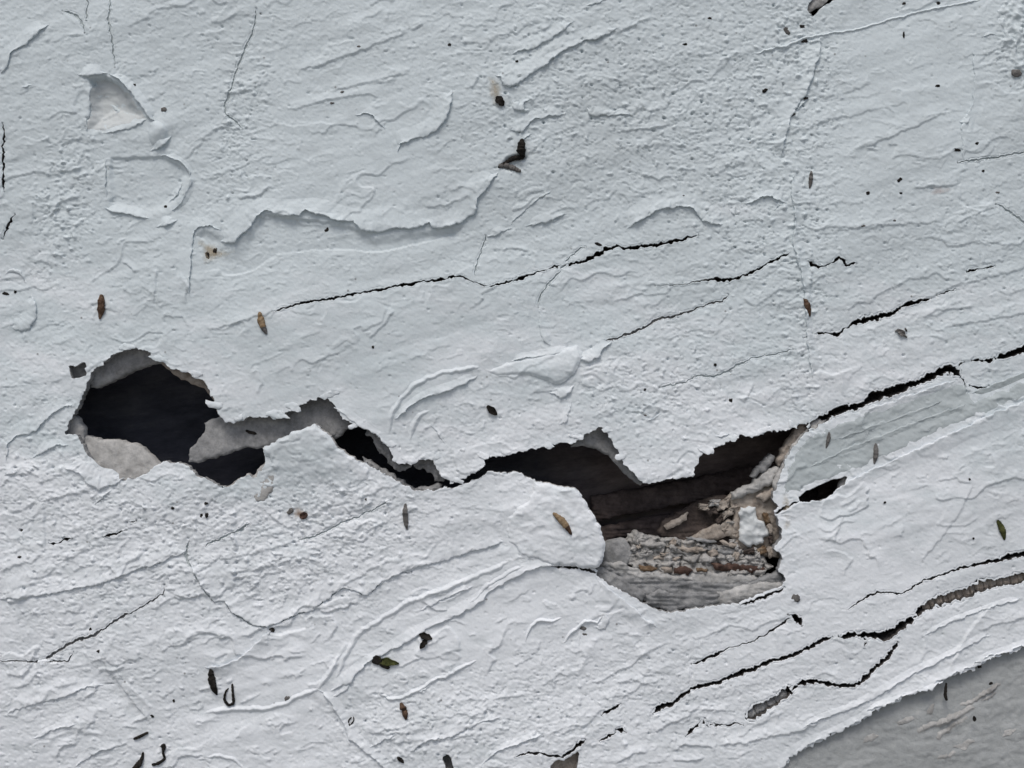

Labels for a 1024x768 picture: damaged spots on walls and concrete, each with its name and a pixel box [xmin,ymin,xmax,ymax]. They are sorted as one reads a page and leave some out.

peeling [85,343,222,416]
peeling [319,391,397,447]
crack [272,233,699,313]
peeling [488,311,659,485]
crack [604,251,857,342]
crack [660,264,995,389]
peeling [780,372,1024,520]
crack [806,343,1024,431]
peeling [737,506,770,548]
peeling [190,526,504,680]
crack [652,550,1024,738]
flaking render [775,633,1024,768]